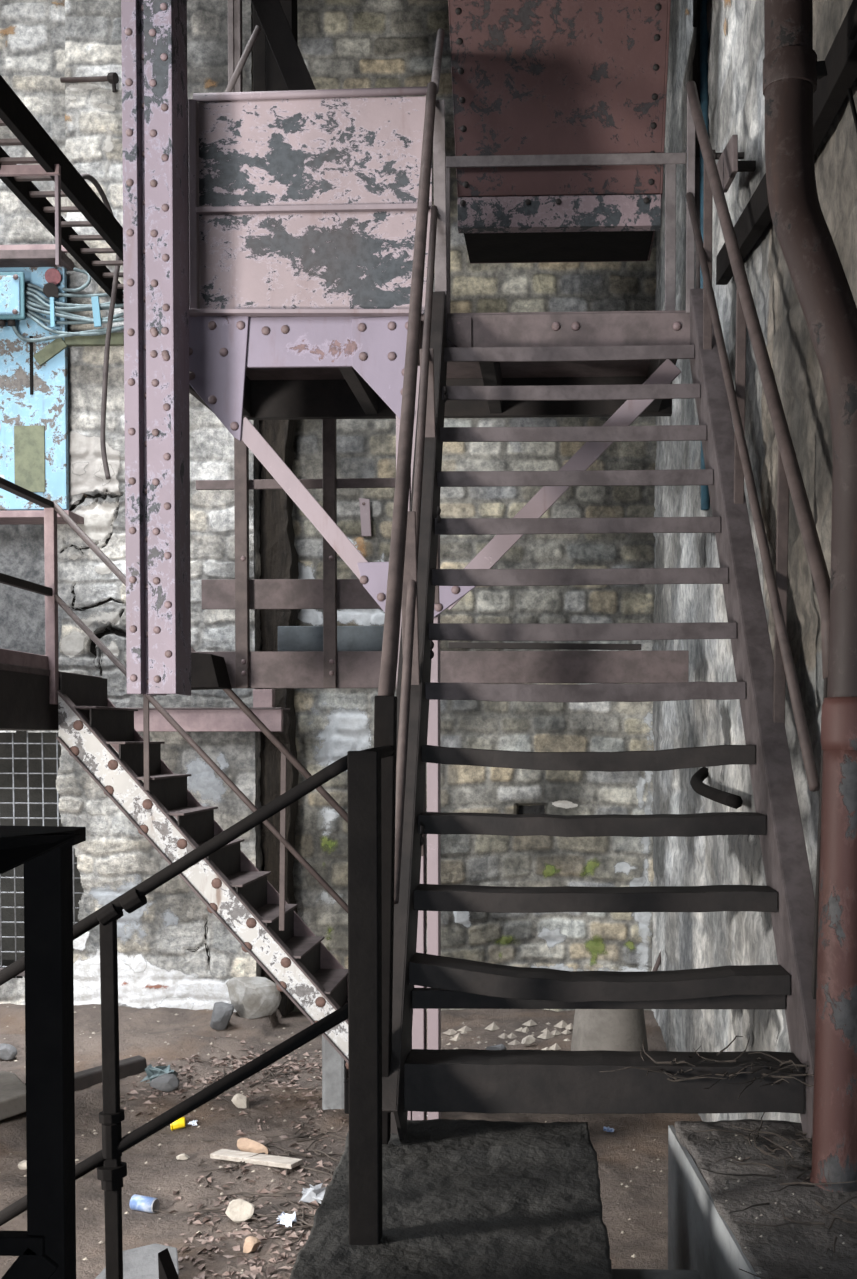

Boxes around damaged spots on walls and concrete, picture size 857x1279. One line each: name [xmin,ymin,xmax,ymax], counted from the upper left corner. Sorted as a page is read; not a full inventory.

crack [60,490,122,555]
crack [69,584,126,676]
peeling [73,931,101,1005]
peeling [117,951,236,1012]